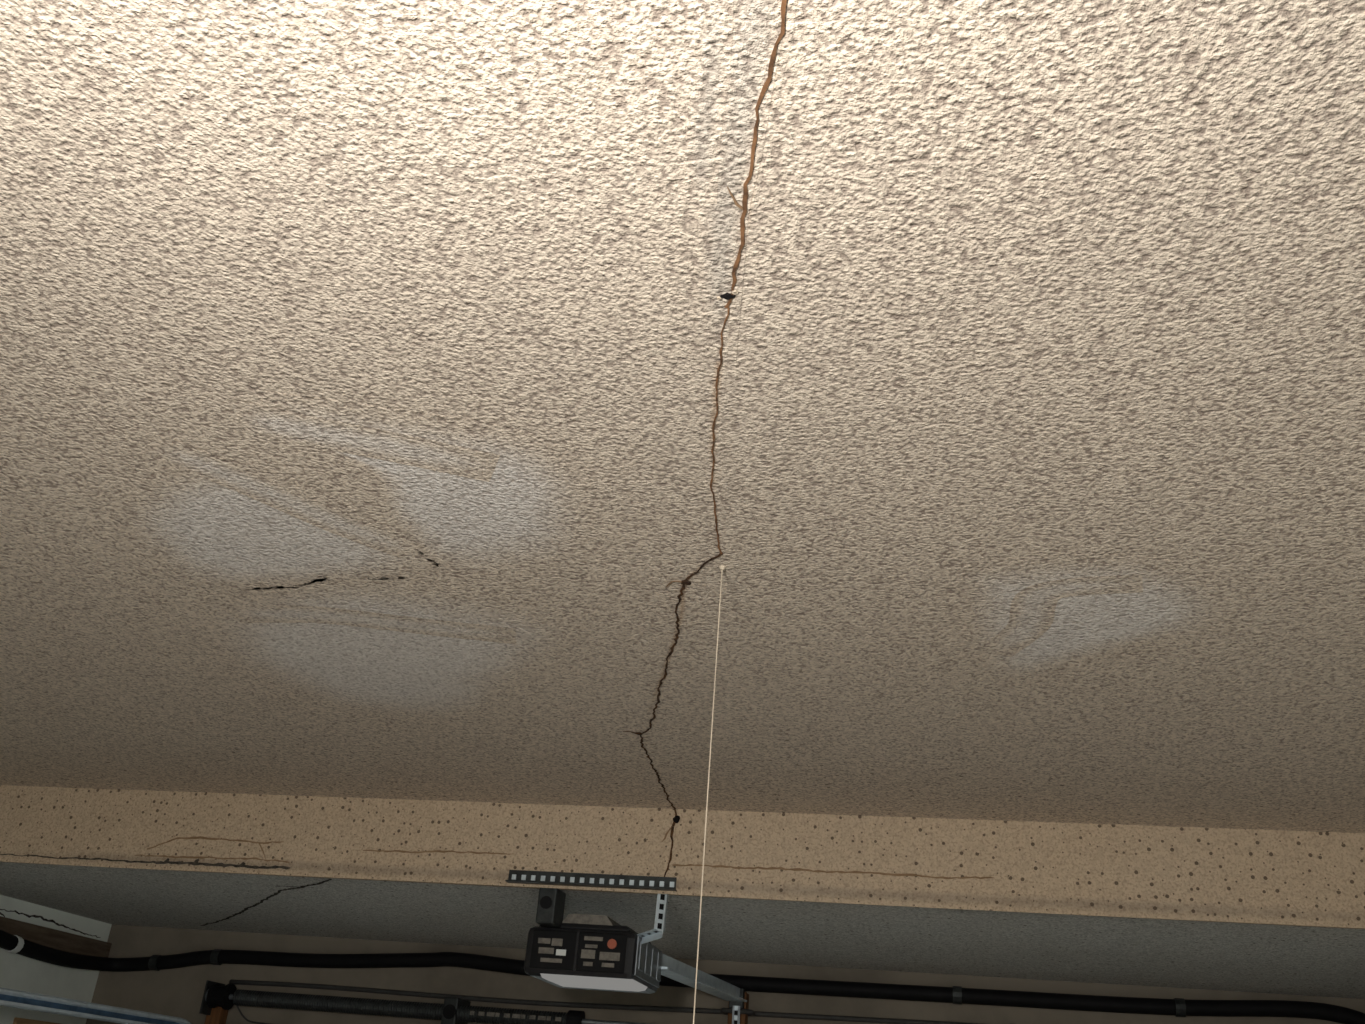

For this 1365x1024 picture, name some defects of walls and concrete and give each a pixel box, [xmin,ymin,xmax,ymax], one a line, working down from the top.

water stain [113,392,598,722]
crack [624,0,994,879]